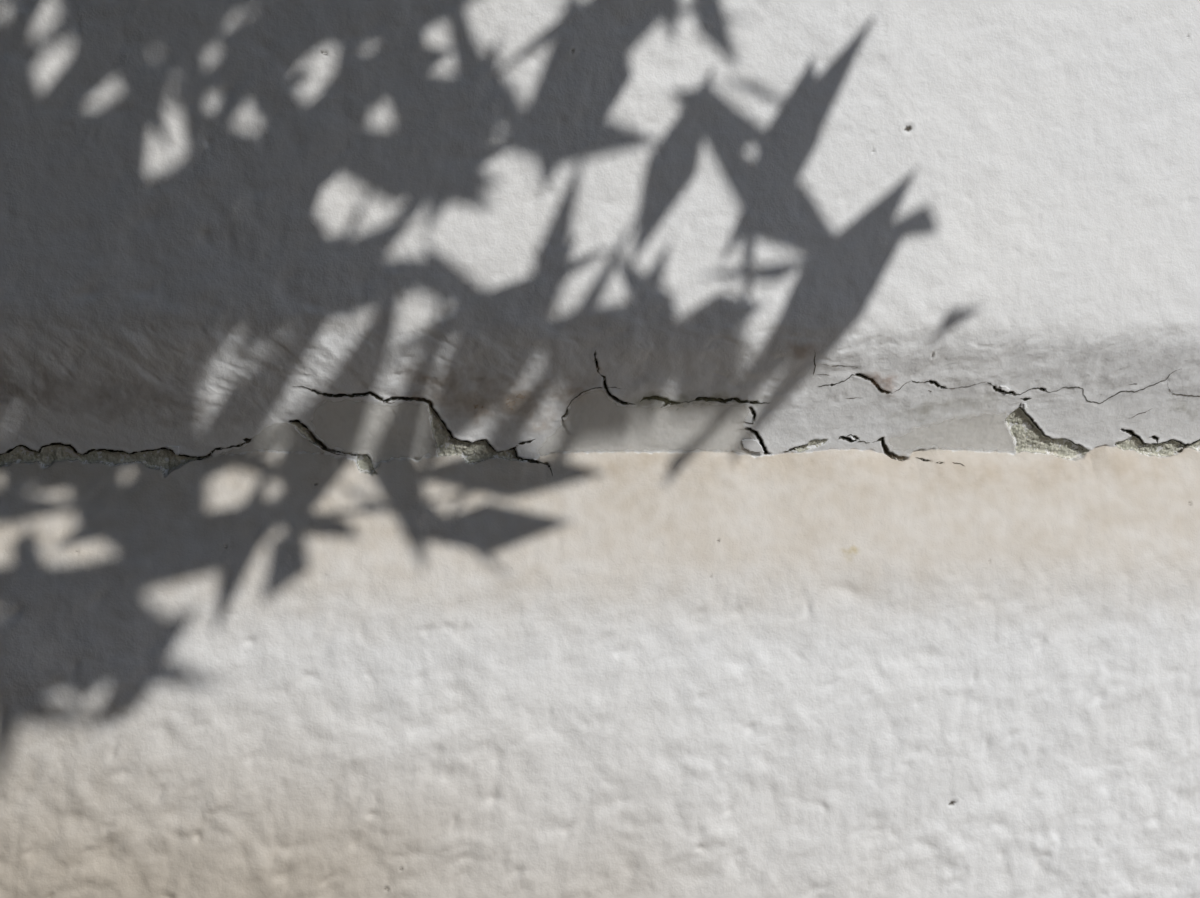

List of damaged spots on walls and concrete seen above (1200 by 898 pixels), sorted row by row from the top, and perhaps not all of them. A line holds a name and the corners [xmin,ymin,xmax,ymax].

spalling [0,445,209,475]
spalling [357,455,377,475]
crack [289,386,553,476]
spalling [429,407,523,464]
crack [561,353,964,466]
spalling [795,439,827,452]
crack [813,357,1200,453]
spalling [1006,408,1088,459]
spalling [1115,436,1200,457]